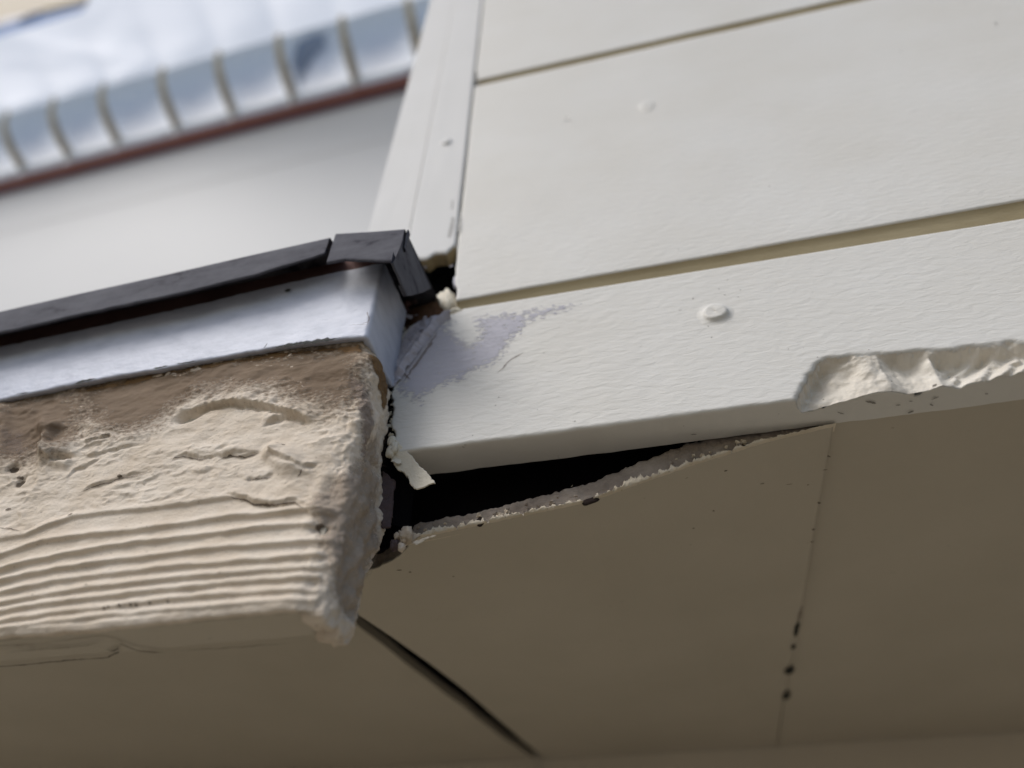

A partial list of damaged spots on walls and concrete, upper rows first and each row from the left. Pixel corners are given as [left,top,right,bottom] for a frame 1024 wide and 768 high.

spalling [797,342,1024,412]
crack [380,387,415,527]